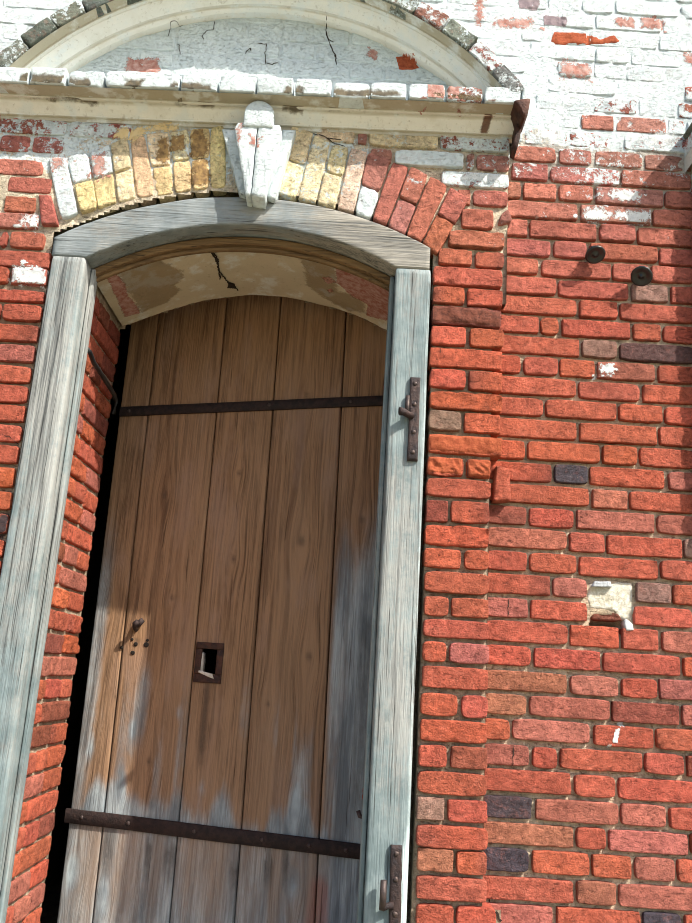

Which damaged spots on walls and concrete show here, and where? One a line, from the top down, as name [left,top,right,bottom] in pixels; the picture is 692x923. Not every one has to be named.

crack [326,16,337,65]
spalling [473,0,619,45]
peeling [614,15,667,33]
peeling [557,58,593,83]
crack [211,253,238,291]